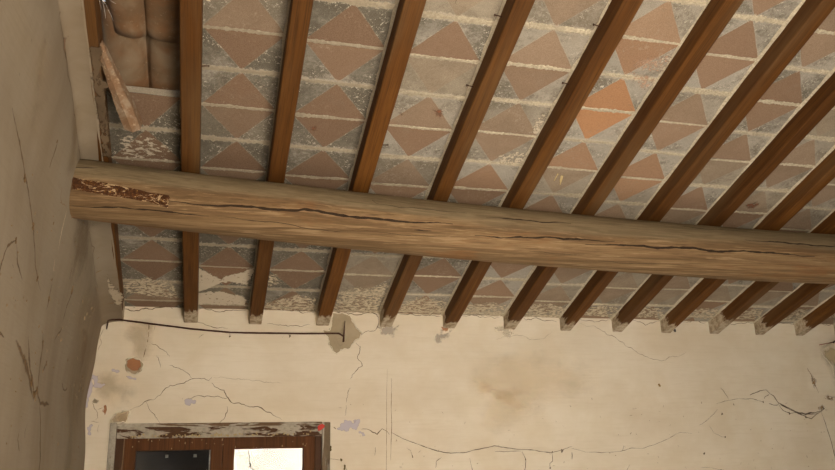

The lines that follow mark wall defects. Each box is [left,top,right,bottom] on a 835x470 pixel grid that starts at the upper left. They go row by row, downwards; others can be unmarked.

crack [138,344,282,422]
flaking render [322,312,362,355]
crack [334,312,379,429]